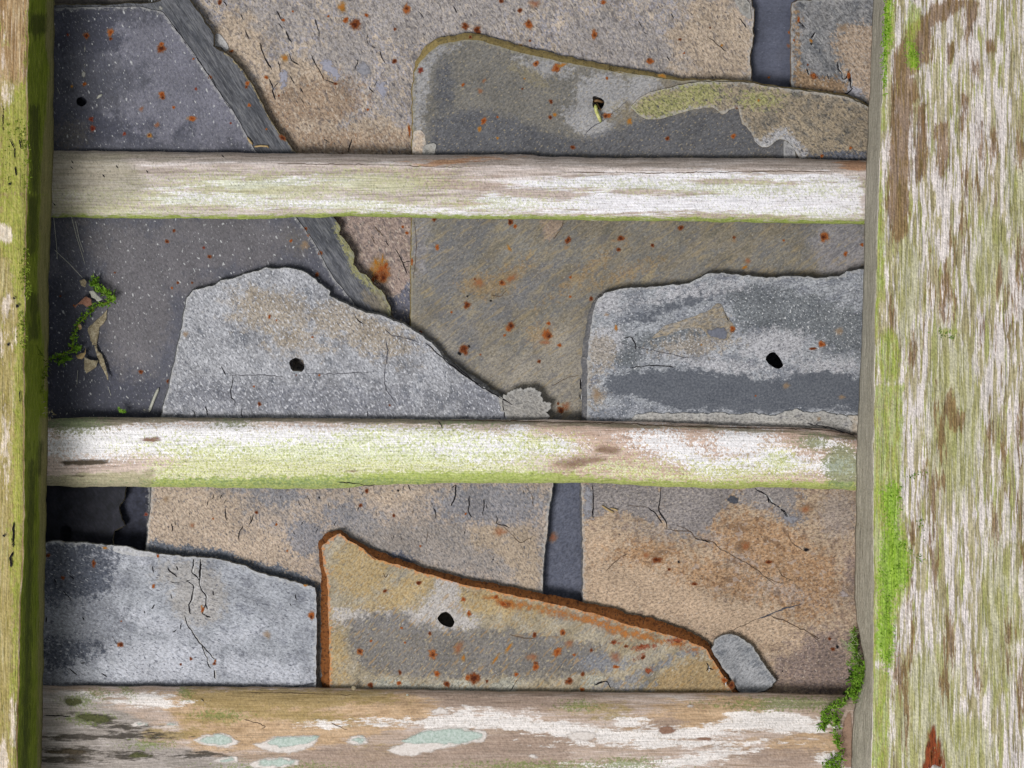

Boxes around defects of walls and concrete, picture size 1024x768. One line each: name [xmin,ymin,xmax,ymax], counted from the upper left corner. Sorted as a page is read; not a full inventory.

crack [629,488,819,642]
crack [144,559,216,701]
rust [428,650,450,687]
rust [465,672,488,684]
rust [484,595,698,674]
rust [923,726,945,768]